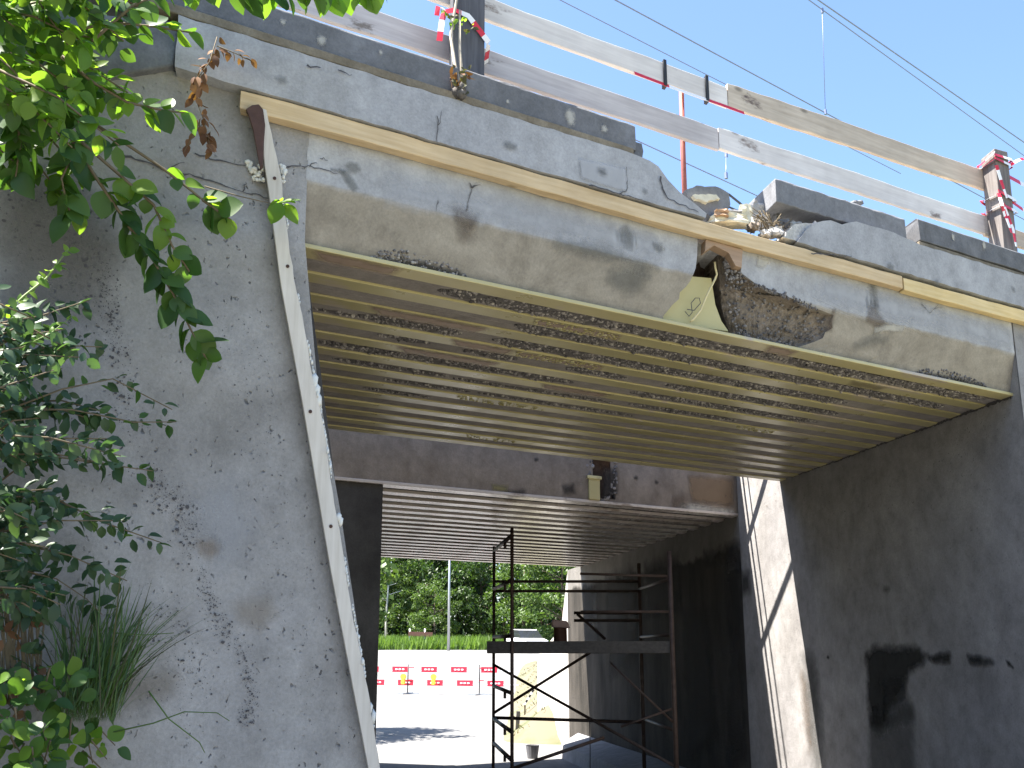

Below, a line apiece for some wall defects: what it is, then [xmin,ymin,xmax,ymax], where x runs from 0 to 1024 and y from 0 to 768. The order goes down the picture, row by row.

crack [124,153,269,199]
crack [589,167,698,212]
spalling [692,255,832,347]
leakage [967,655,993,665]
leakage [865,647,950,768]